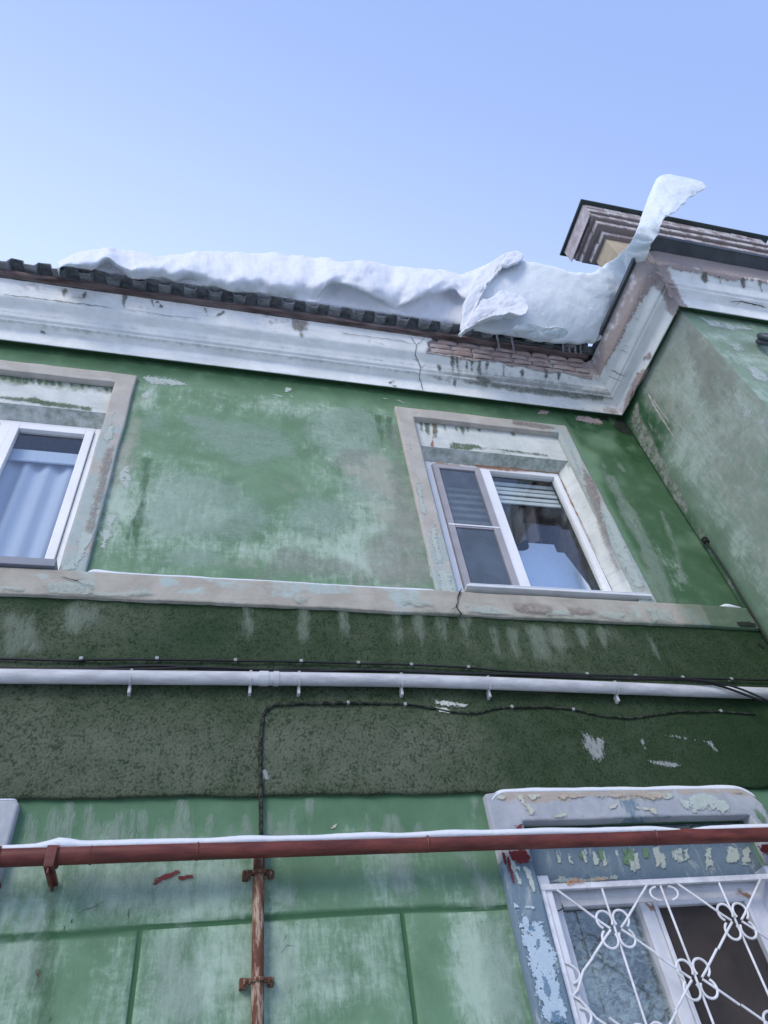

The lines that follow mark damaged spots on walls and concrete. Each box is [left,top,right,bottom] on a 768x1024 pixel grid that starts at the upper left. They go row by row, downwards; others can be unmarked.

crack [346,333,424,388]
spalling [426,339,592,379]
peeling [141,375,187,399]
peeling [554,791,742,817]
peeling [550,846,690,883]
peeling [704,844,751,870]
peeling [513,902,568,1024]